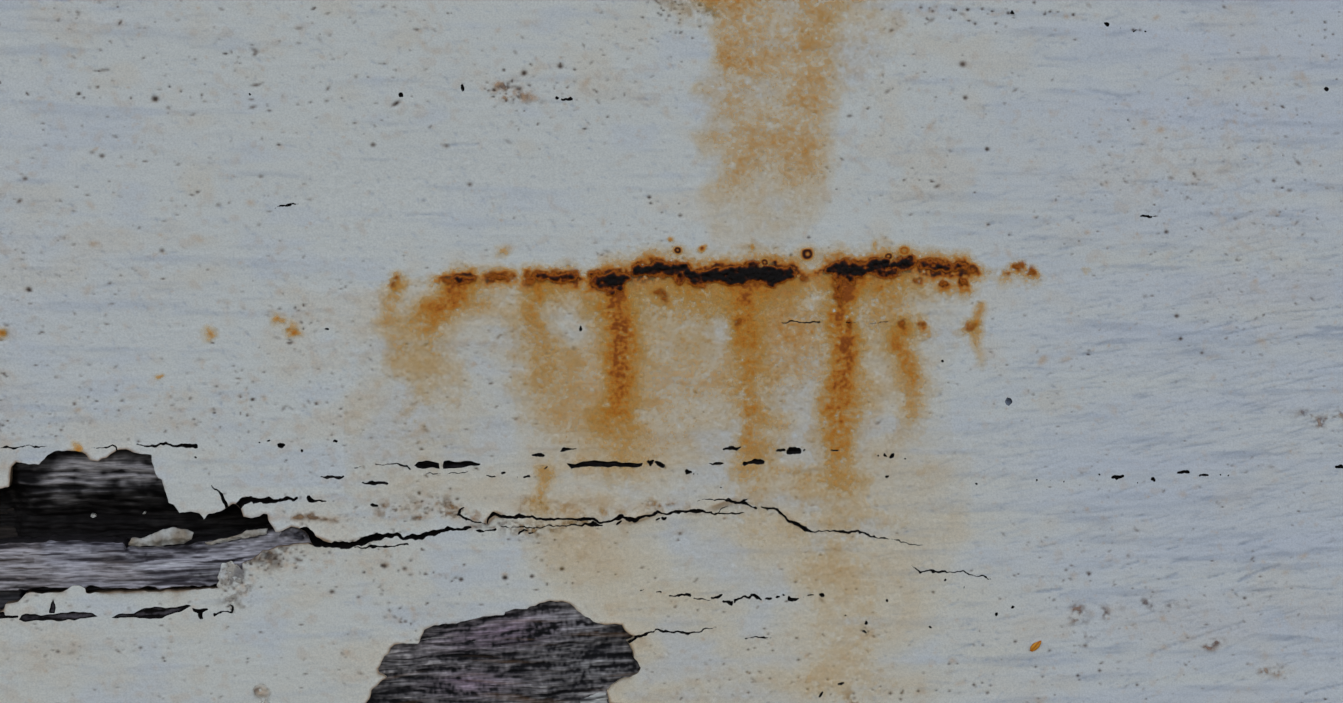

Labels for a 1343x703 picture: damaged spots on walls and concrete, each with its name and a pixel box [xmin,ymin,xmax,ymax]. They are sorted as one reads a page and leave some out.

rust [701,0,839,185]
rust [384,272,405,348]
rust [1002,262,1040,280]
rust [409,237,984,490]
crack [1,443,47,451]
peeling [0,449,312,612]
crack [94,439,989,580]
crack [1098,470,1229,484]
peeling [366,601,641,703]